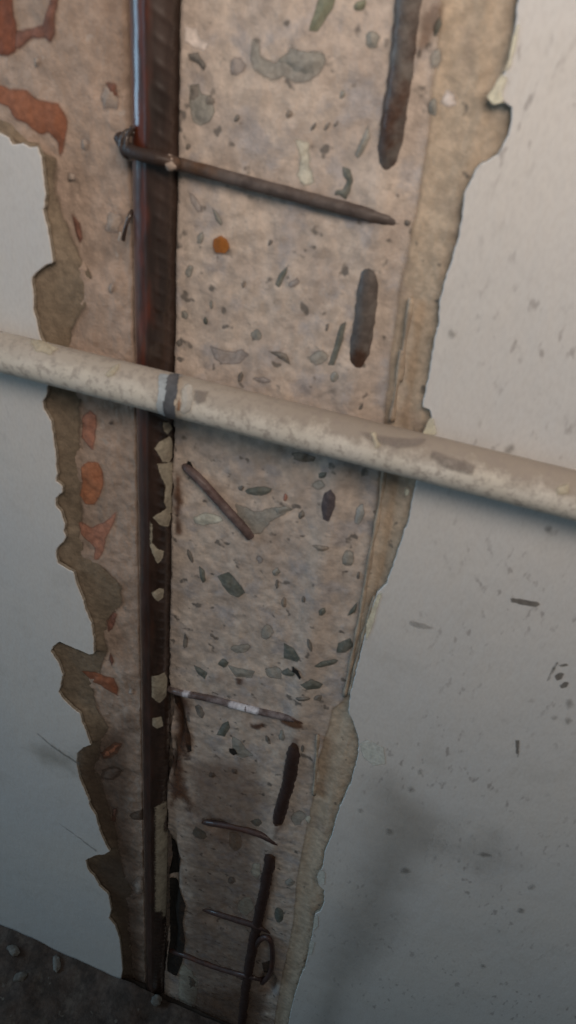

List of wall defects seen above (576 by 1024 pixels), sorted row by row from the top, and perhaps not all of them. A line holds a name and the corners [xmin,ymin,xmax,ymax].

spalling [0,0,519,435]
rust [174,477,182,534]
rust [170,696,192,805]
spalling [46,386,416,1024]
rust [280,718,302,728]